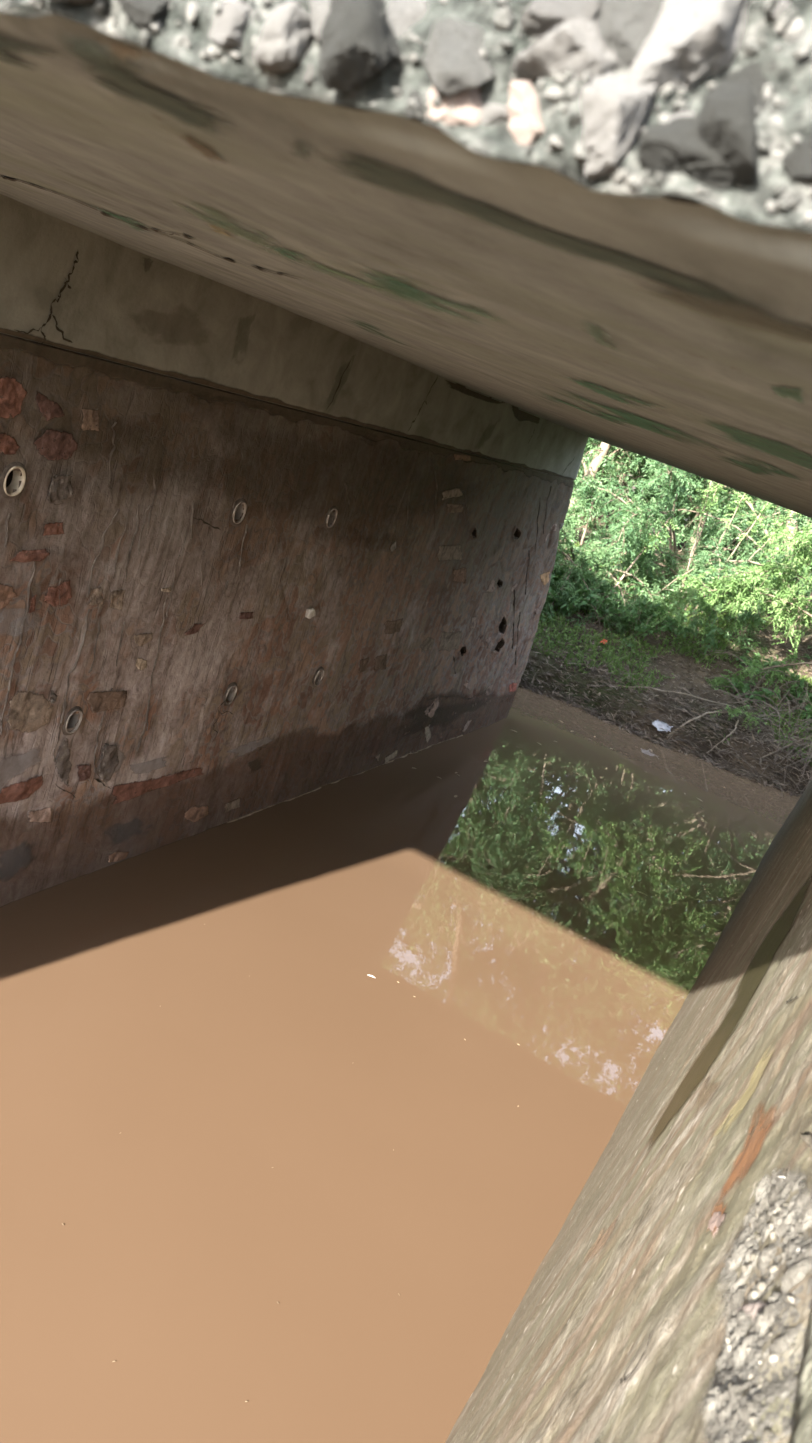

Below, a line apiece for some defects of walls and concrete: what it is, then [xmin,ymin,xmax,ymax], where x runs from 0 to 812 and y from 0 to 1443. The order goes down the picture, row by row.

crack [16,251,79,345]
water stain [330,156,812,344]
water stain [446,380,540,424]
corrosion [711,1107,773,1231]
spalling [800,1127,812,1151]
spalling [702,1169,812,1443]